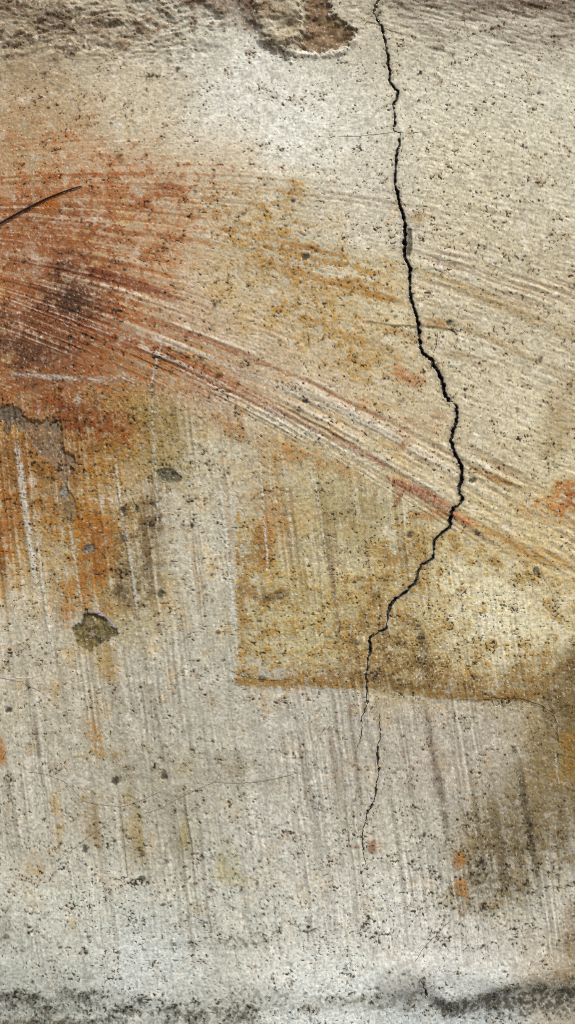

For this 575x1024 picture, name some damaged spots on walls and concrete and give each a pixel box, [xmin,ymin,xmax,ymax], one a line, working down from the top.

flaking render [0,0,171,79]
spalling [181,0,357,56]
rust [0,115,292,627]
peeling [0,406,77,524]
crack [338,0,464,864]
rust [336,436,477,526]
rust [524,479,575,522]
spalling [72,609,119,651]